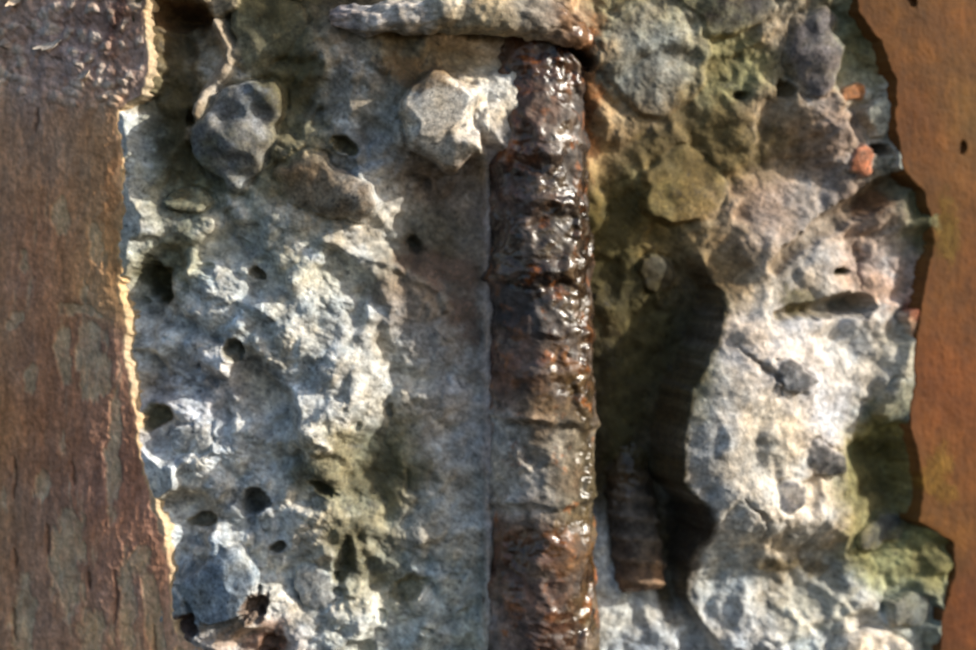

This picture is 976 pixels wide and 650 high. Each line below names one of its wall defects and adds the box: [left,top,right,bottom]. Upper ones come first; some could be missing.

rust [567,27,603,165]
rust [489,189,580,261]
spalling [88,0,518,650]
spalling [554,0,953,650]
rust [495,539,571,613]